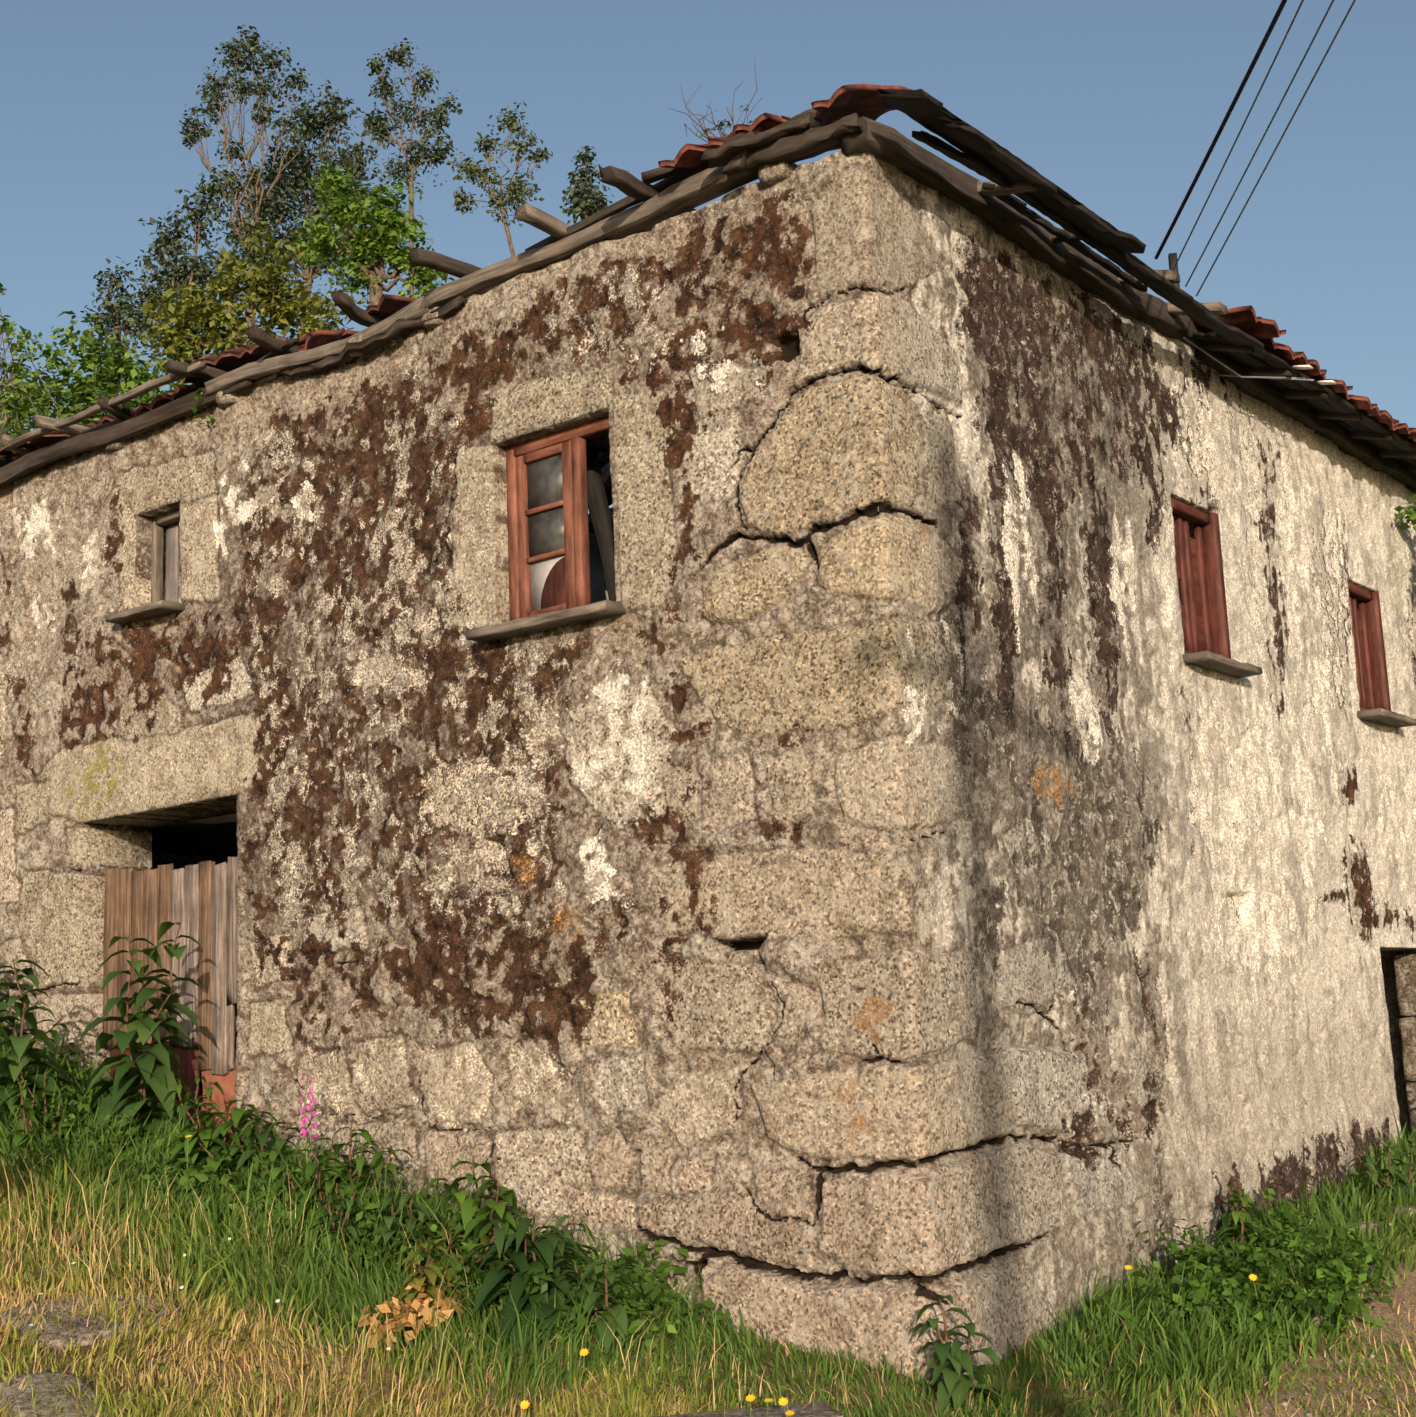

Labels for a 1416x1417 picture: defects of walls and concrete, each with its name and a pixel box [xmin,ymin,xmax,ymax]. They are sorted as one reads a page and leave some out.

crack [694,365,962,576]
leakage [0,548,18,596]
leakage [54,187,820,1088]
leakage [936,220,1290,1037]
leakage [1302,471,1361,805]
crack [734,981,785,1120]
crack [862,1044,901,1063]
crack [1015,999,1074,1057]
crack [745,1133,1139,1227]
leakage [1212,1117,1390,1245]
crack [637,1224,1049,1306]